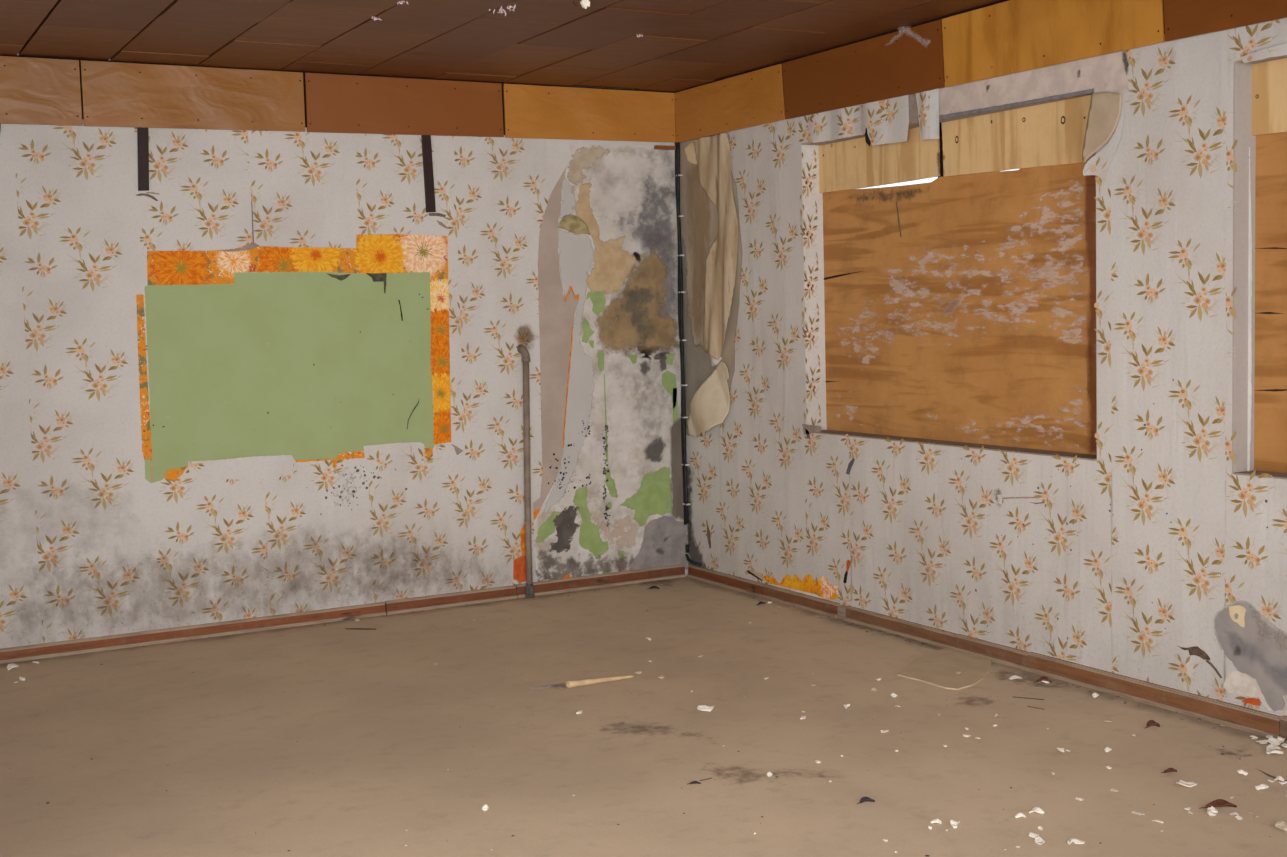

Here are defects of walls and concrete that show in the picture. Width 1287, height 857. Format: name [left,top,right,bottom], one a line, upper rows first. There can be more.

flaking render [533,135,742,582]
leakage [320,465,382,515]
flaking render [1213,600,1287,715]